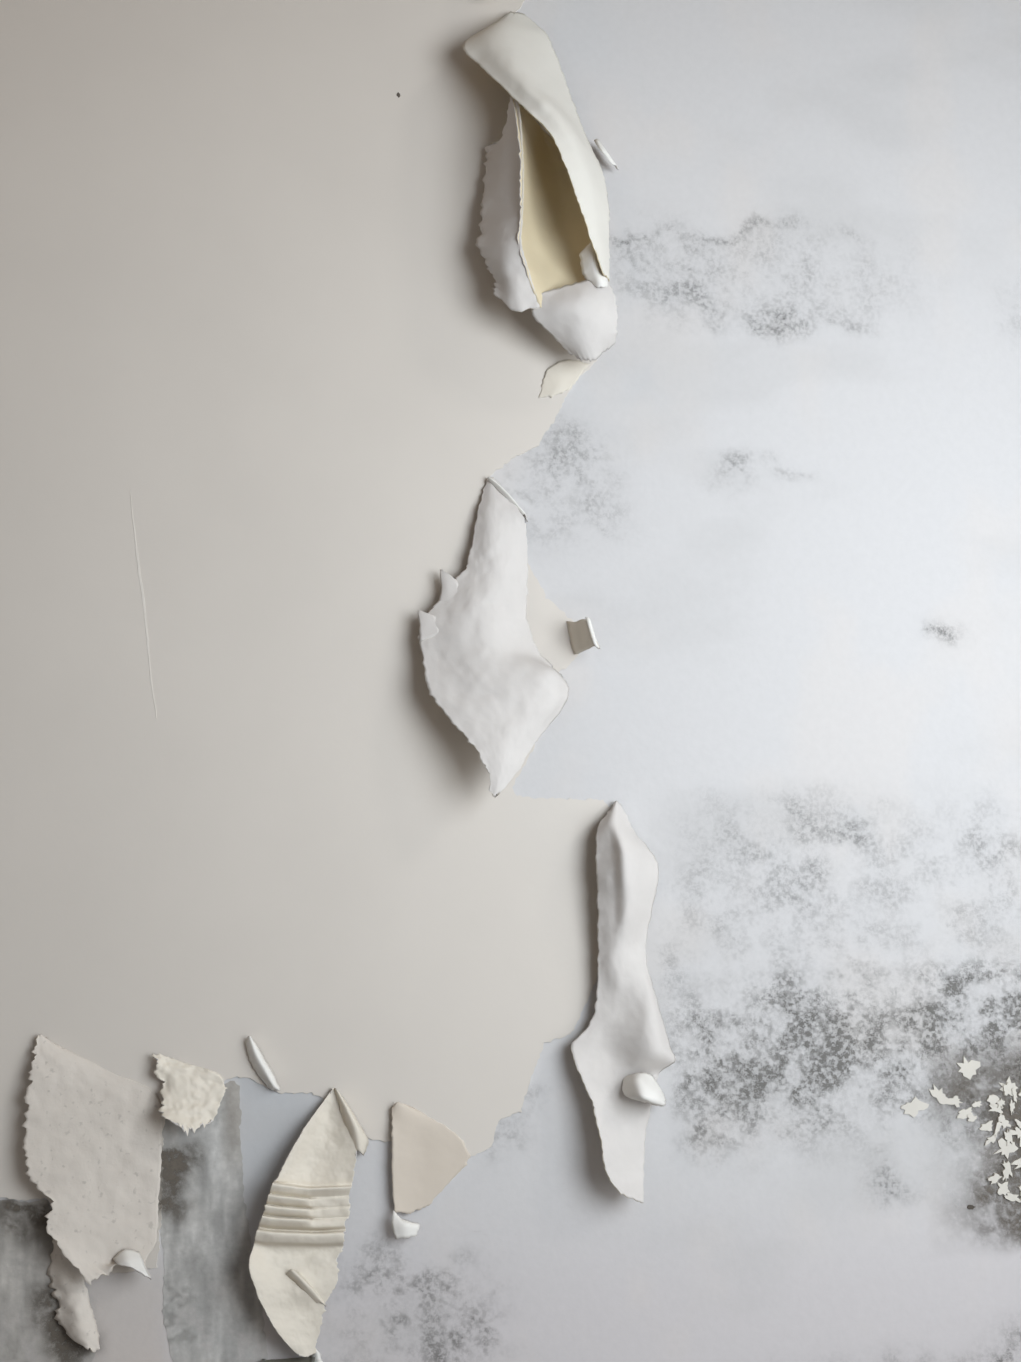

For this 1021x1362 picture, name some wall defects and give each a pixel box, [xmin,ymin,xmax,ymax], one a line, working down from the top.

peeling [315,0,1021,1362]
mould [684,974,990,1118]
mould [970,993,1021,1080]
damp [0,1200,48,1235]
peeling [0,1034,369,1362]
damp [36,1289,90,1362]